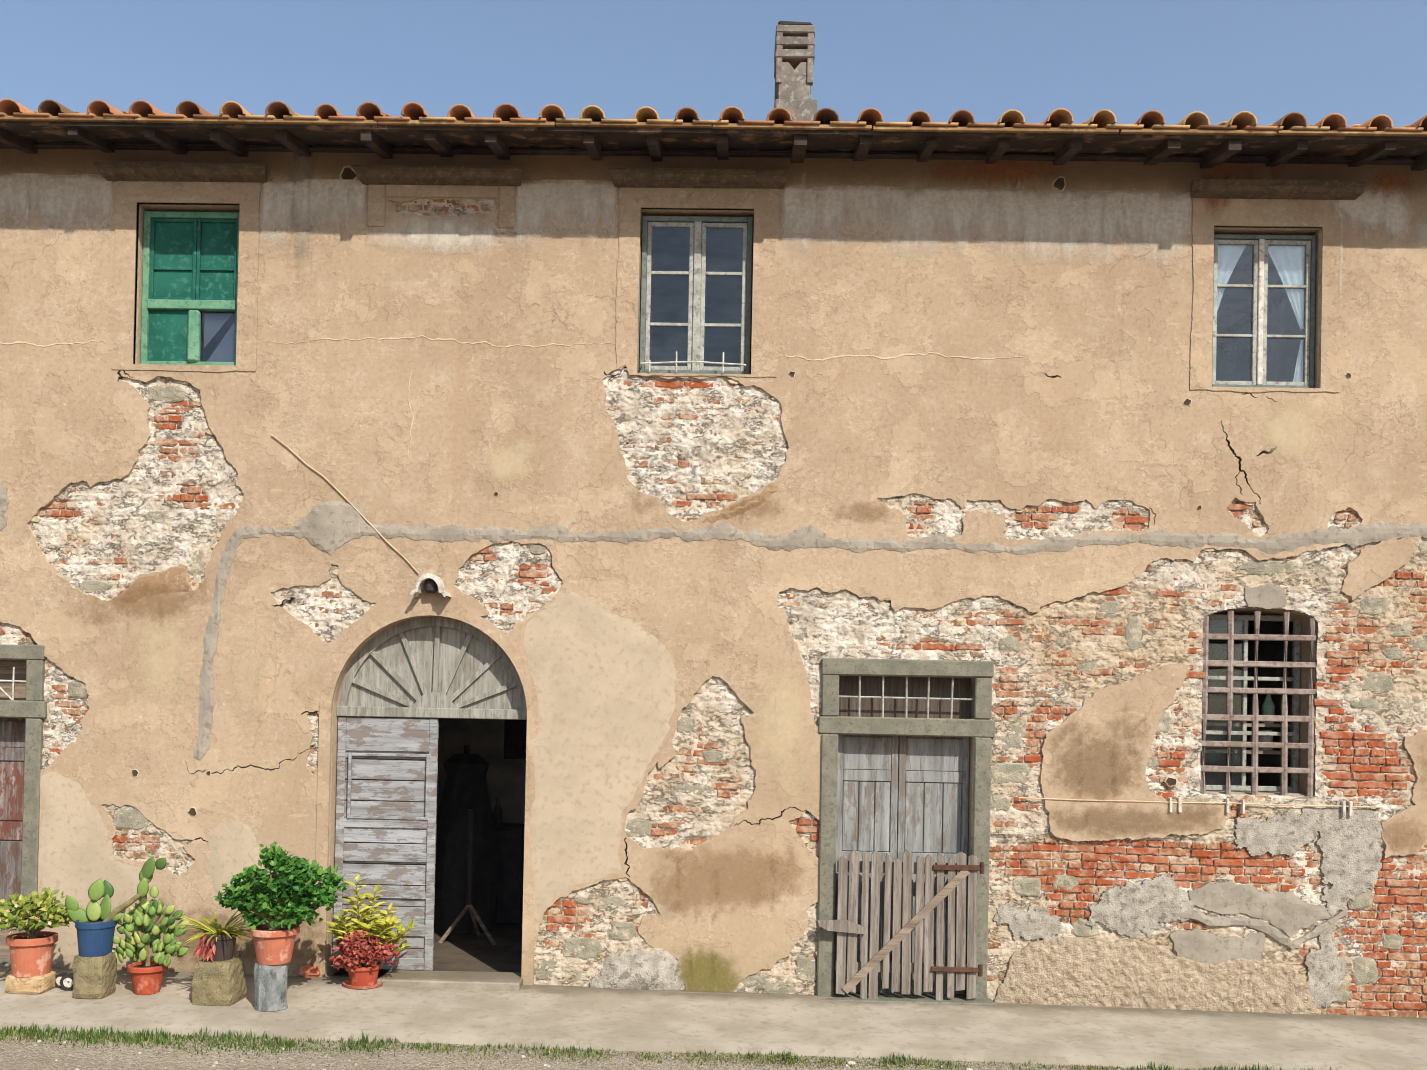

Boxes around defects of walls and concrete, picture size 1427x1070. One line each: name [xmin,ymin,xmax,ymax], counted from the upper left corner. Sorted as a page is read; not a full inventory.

spalling [29,374,244,600]
spalling [603,368,789,522]
spalling [878,493,1155,541]
crack [1221,393,1277,504]
spalling [455,541,563,637]
spalling [0,622,89,770]
crack [187,711,316,774]
crack [623,839,631,877]
spalling [625,676,756,851]
crack [736,807,816,825]
spalling [776,508,1427,1018]
spalling [534,877,678,987]